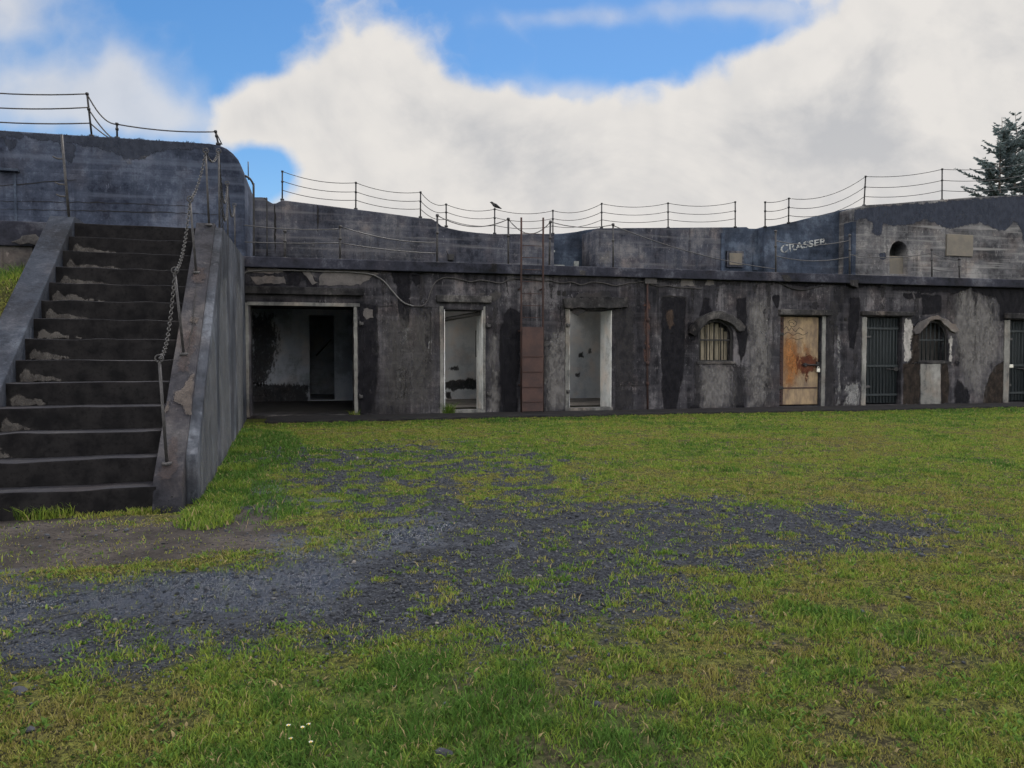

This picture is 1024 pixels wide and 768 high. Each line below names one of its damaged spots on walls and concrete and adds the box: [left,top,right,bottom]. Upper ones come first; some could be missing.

peeling [247,268,286,285]
peeling [303,269,379,286]
peeling [0,394,45,432]
peeling [19,244,120,382]
spalling [165,373,195,415]
peeling [445,366,476,399]
water stain [491,276,520,412]
corrosion [783,340,819,383]
water stain [655,250,1024,409]
peeling [903,318,913,362]